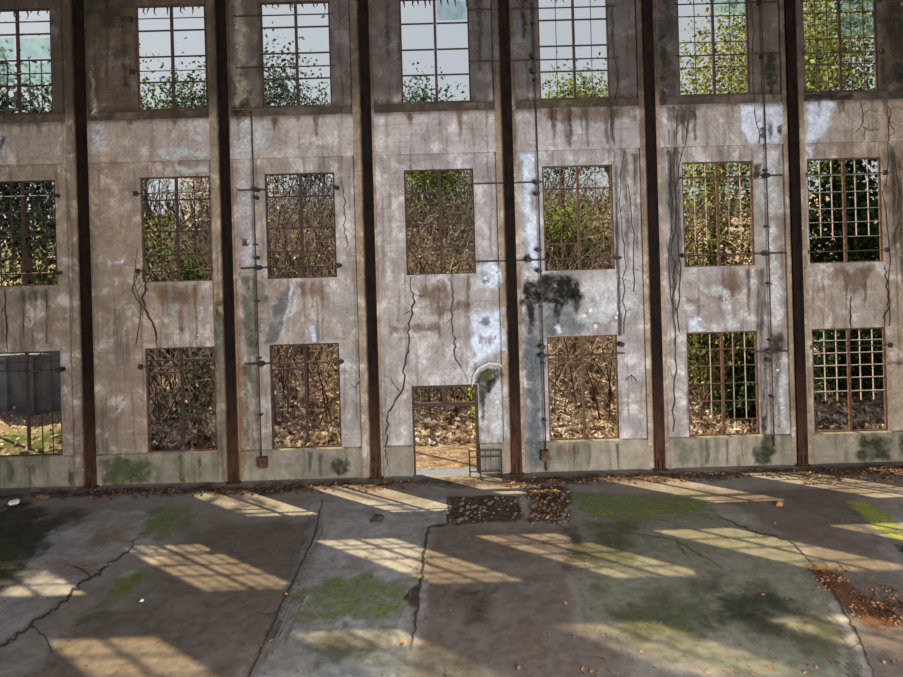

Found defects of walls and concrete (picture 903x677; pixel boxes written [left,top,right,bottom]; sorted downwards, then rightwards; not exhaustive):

water stain [541,100,623,143]
peeling [806,101,835,155]
peeling [741,106,782,325]
crack [132,268,158,347]
crack [385,277,425,476]
crack [446,277,469,383]
peeling [468,310,505,373]
peeling [477,260,502,288]
crack [0,534,141,655]
crack [248,499,323,677]
crack [405,499,449,650]